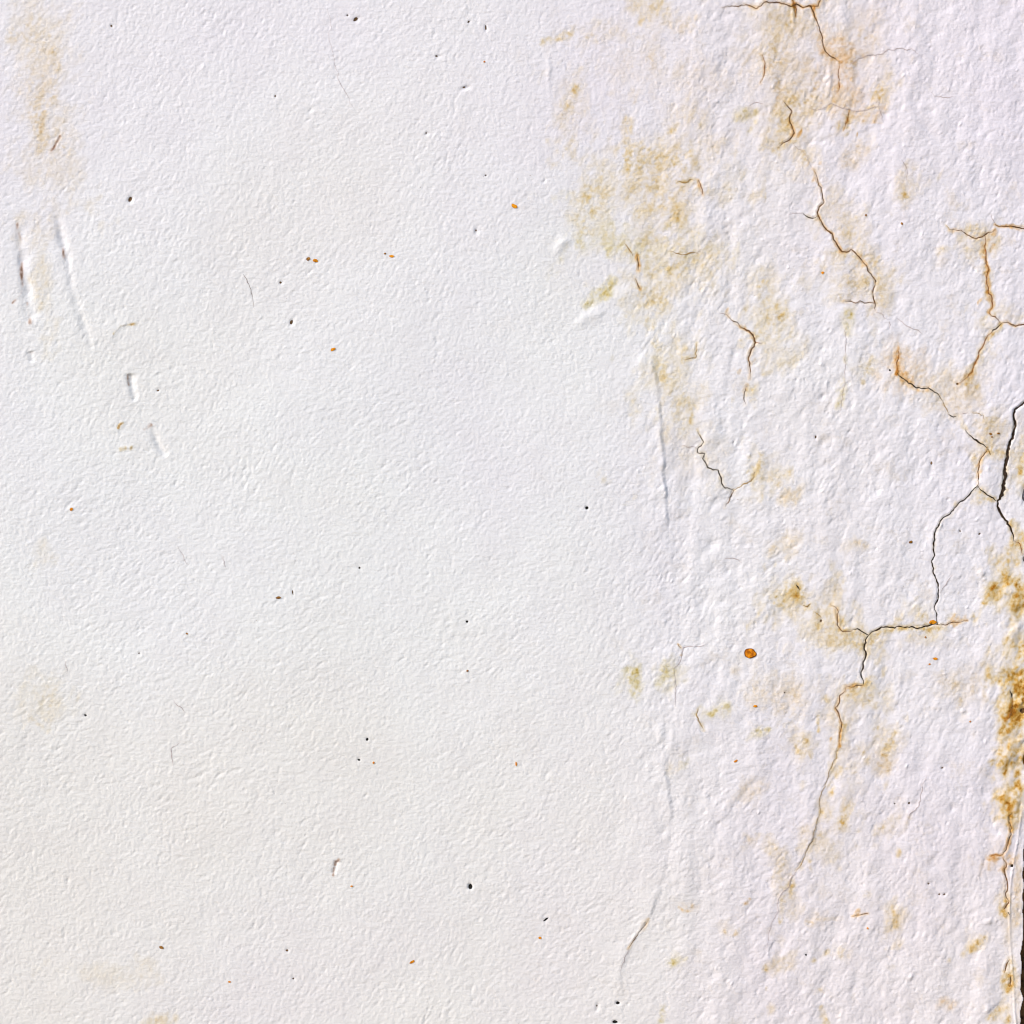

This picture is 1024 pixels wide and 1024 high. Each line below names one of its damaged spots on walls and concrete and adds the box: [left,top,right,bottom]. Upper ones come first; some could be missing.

crack [721,0,921,333]
crack [681,436,755,504]
crack [722,313,759,402]
crack [767,215,1024,946]